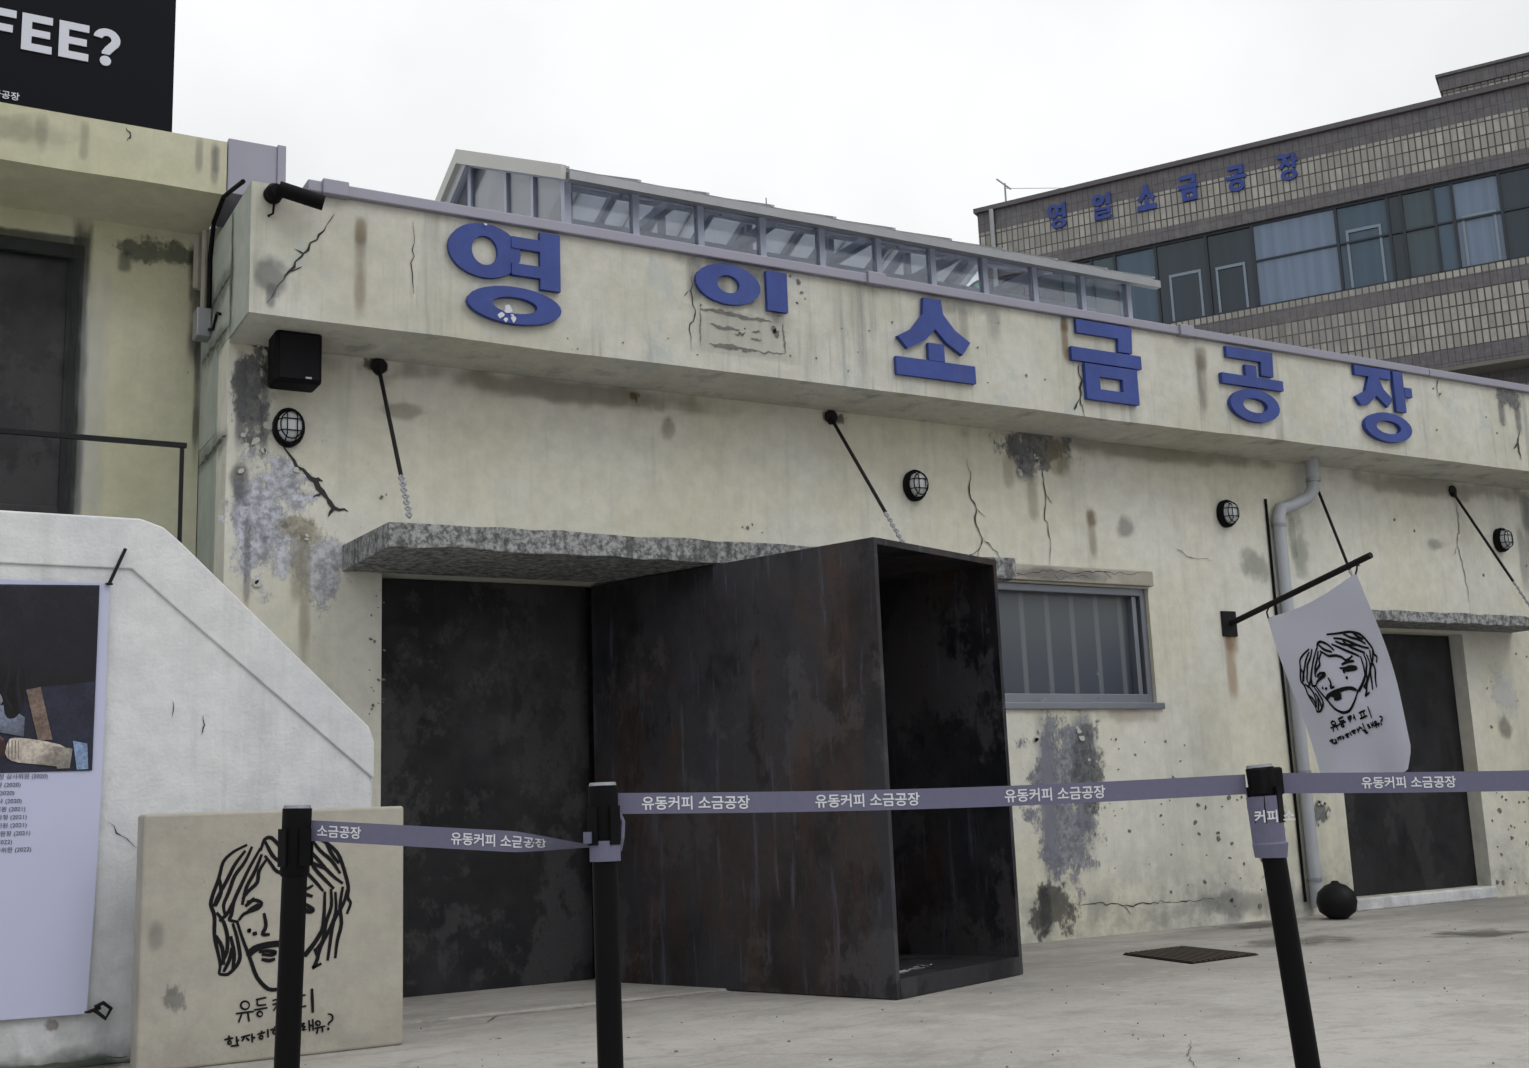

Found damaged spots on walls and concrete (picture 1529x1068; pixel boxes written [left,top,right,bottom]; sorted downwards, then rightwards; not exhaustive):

crack [266,215,334,303]
crack [283,447,348,517]
leakage [279,514,320,542]
crack [967,462,1139,582]
leakage [1028,882,1078,942]